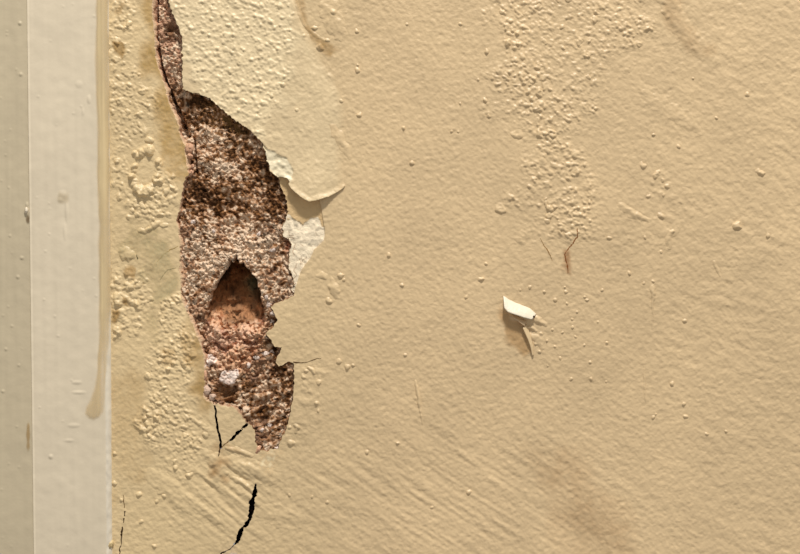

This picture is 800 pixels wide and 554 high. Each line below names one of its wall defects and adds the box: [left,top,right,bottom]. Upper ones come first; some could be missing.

flaking render [152,0,345,454]
peeling [503,296,554,358]
crack [213,403,248,456]
crack [220,484,258,554]